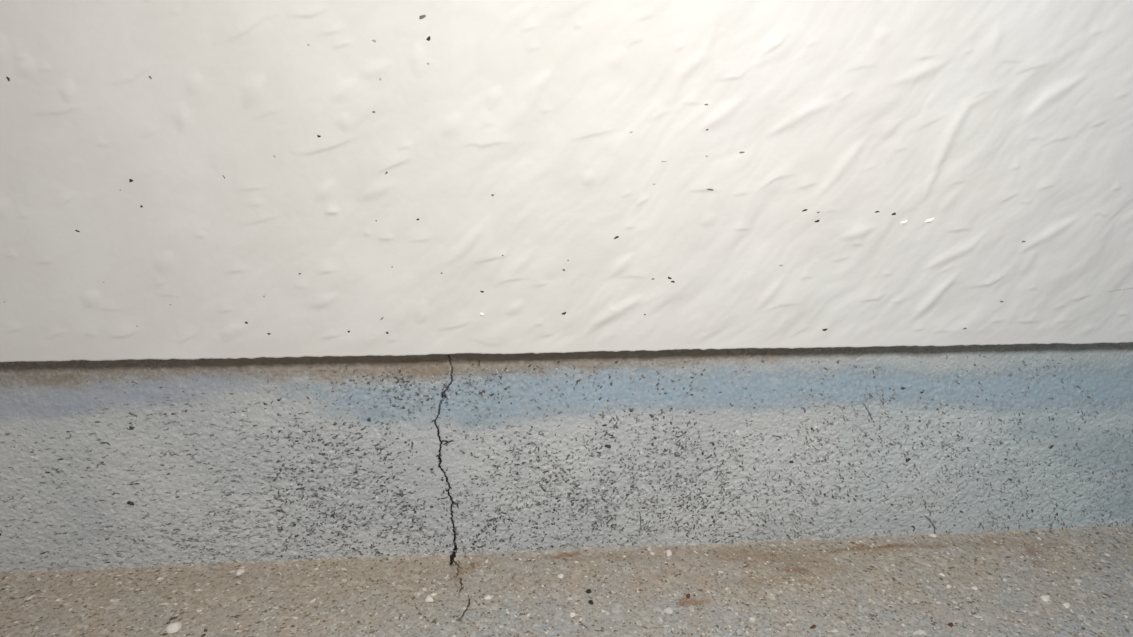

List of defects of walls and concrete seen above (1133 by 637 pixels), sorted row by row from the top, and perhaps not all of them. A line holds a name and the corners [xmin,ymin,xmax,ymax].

crack [431,354,470,621]